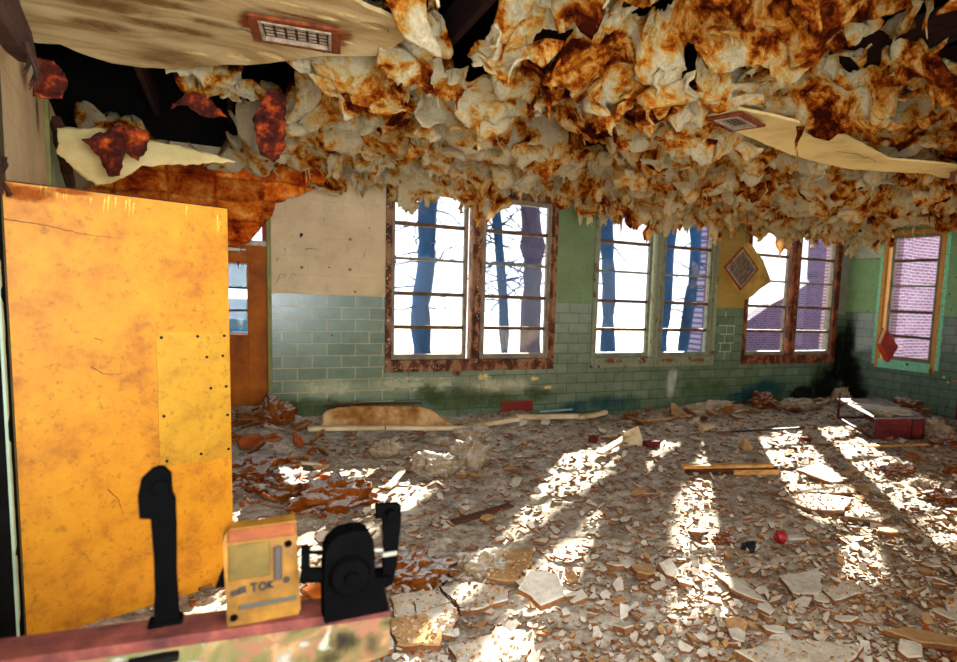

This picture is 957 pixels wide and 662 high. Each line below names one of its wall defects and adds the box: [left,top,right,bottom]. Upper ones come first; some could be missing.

damp [728,322,867,402]